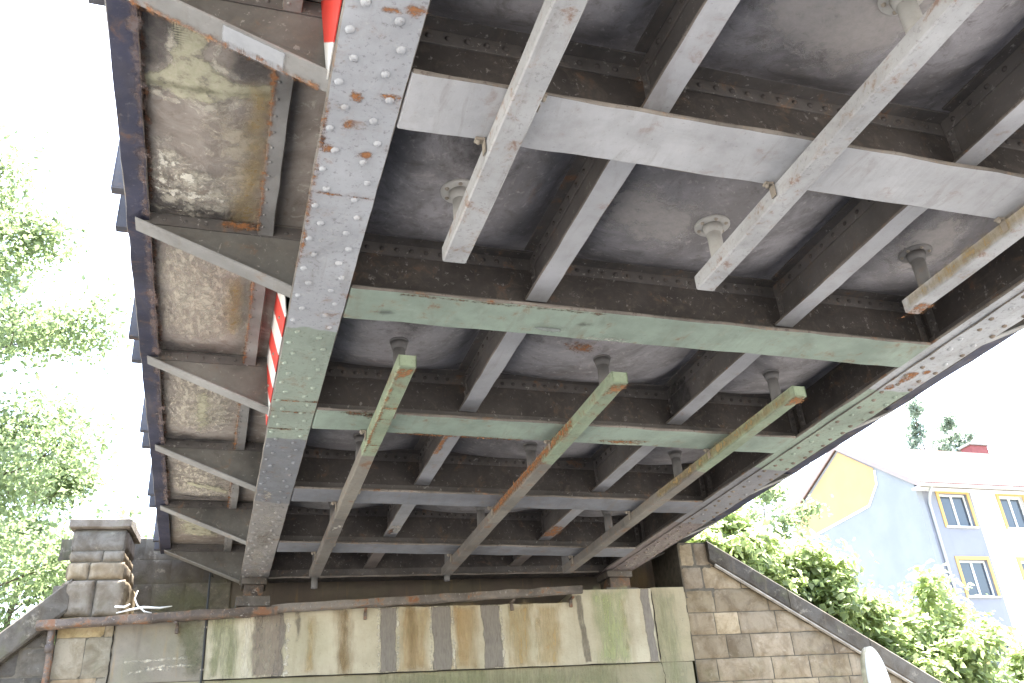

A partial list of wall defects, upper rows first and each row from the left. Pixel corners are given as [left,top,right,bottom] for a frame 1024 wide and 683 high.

leakage [143,21,273,218]
rust [206,35,318,231]
rust [318,109,332,152]
rust [344,369,413,452]
rust [885,371,930,389]
rust [493,418,572,512]
leakage [242,612,300,676]
leakage [377,607,399,672]
leakage [429,606,456,670]
leakage [480,605,505,668]
leakage [576,596,591,662]
leakage [640,588,659,661]